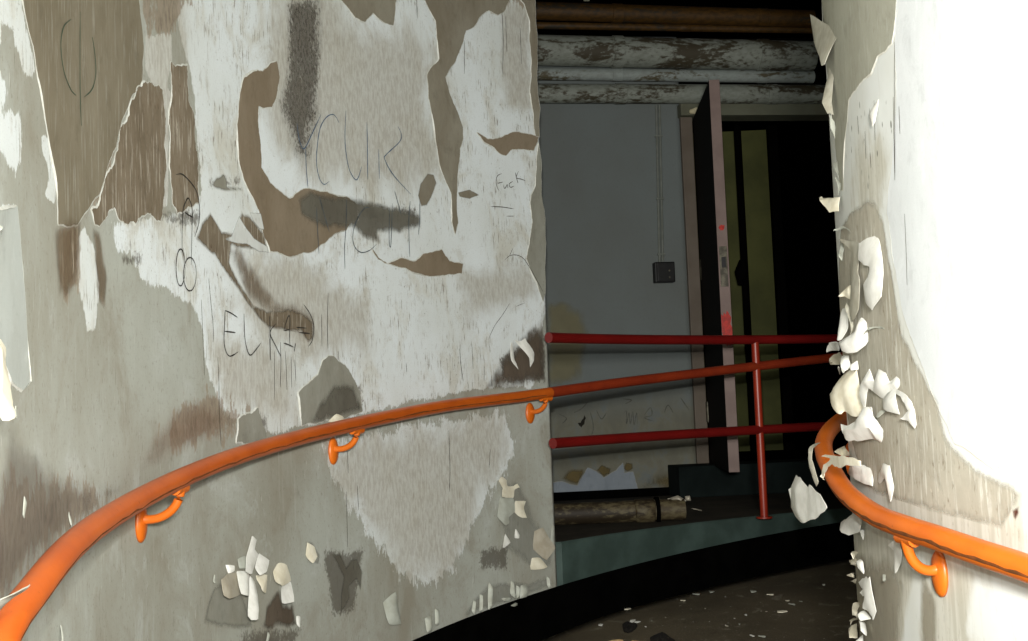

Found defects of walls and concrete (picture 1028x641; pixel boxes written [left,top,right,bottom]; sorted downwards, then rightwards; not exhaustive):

peeling [0,205,32,439]
peeling [21,0,199,228]
peeling [198,60,354,340]
peeling [341,0,396,26]
peeling [370,247,463,277]
peeling [418,0,546,301]
peeling [789,0,1028,641]
peeling [0,584,30,610]
peeling [21,355,555,640]